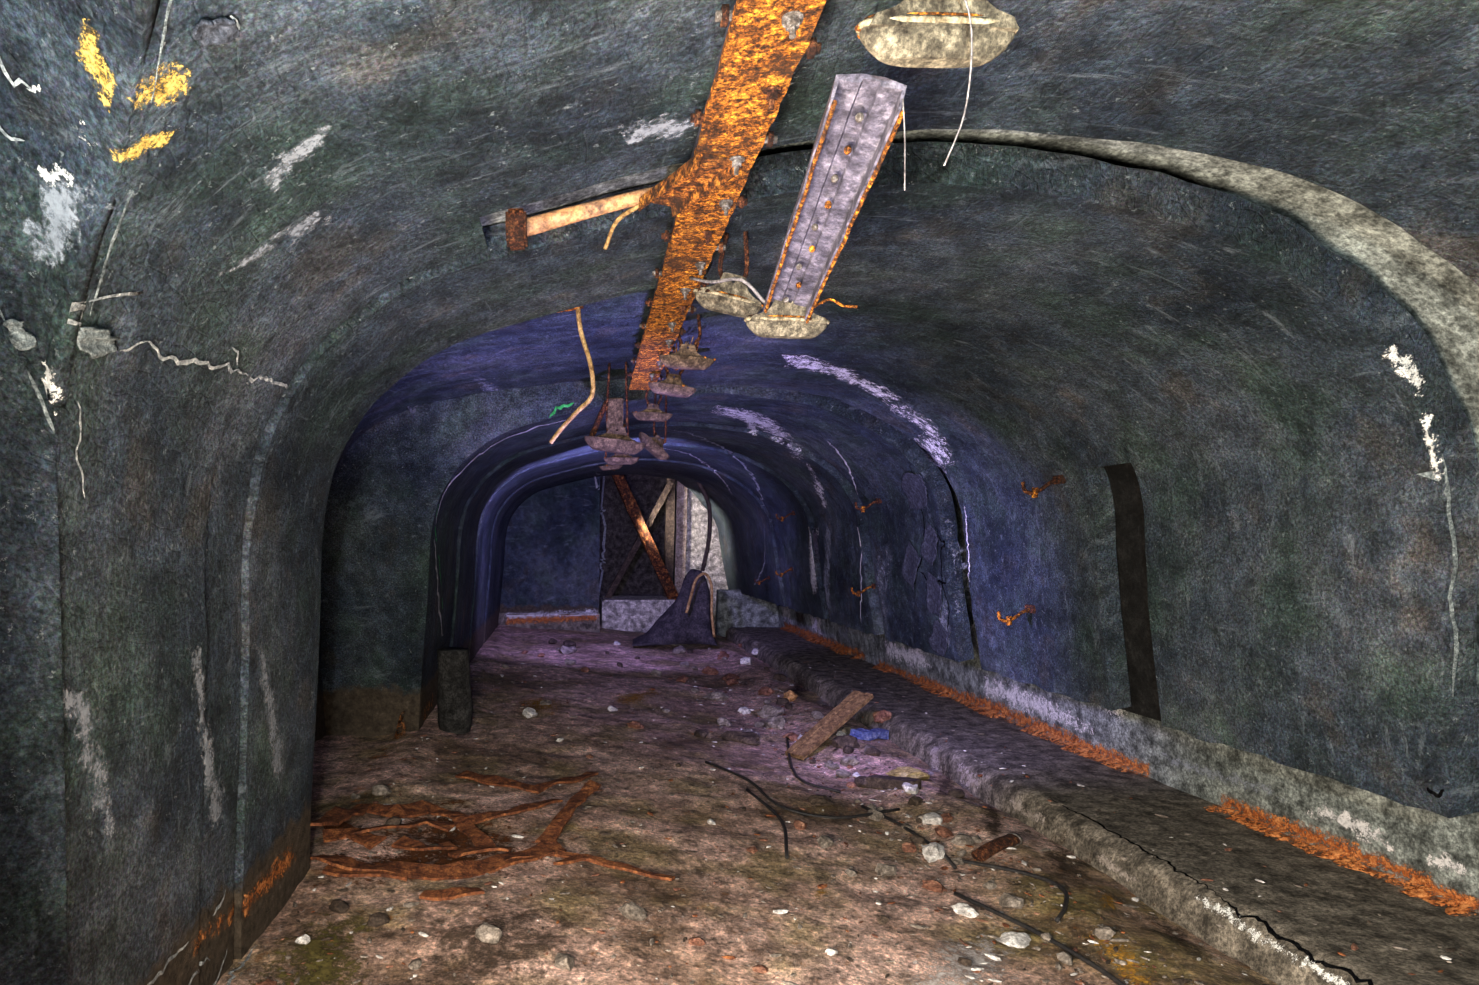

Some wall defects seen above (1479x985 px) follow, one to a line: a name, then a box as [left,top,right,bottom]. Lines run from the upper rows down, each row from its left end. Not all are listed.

efflorescence [23,183,83,265]
corrosion [697,100,905,323]
corrosion [780,624,1151,777]
crack [1051,798,1373,985]
corrosion [1204,794,1479,917]
crack [1427,787,1444,798]